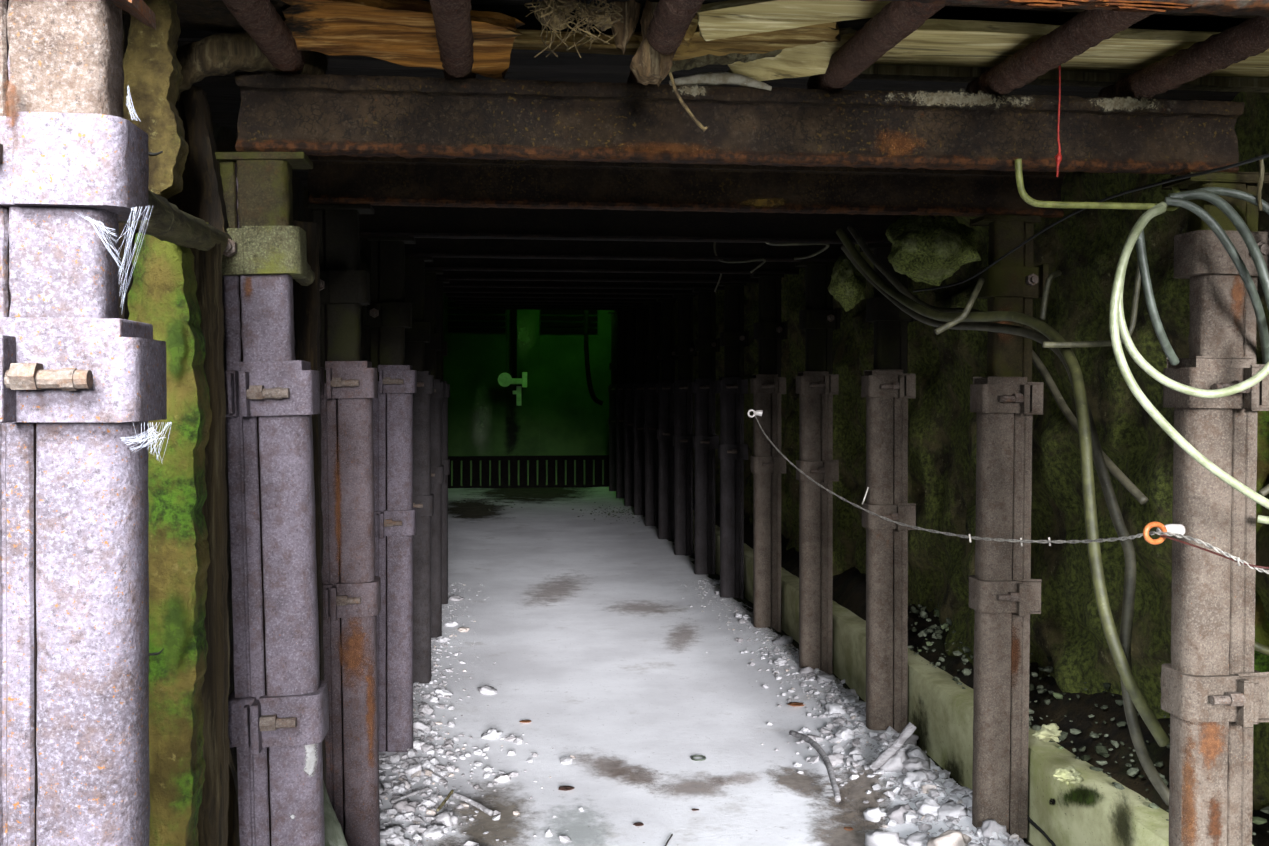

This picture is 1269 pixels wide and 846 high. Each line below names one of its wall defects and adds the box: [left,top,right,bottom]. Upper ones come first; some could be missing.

corrosion [1004,0,1192,12]
corrosion [338,617,376,768]
damp [579,755,653,783]
damp [665,778,724,795]
corrosion [1181,722,1224,846]